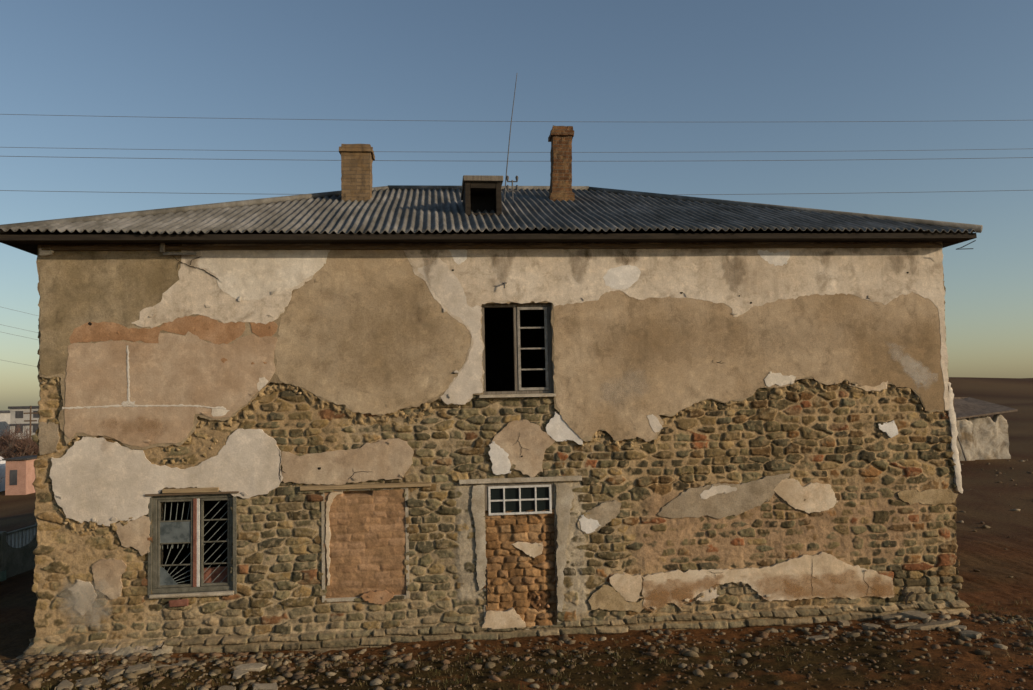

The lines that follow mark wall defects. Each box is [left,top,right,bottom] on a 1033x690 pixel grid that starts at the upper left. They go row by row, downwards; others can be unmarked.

crack [172,255,221,282]
spalling [38,242,963,558]
peeling [69,558,127,615]
spalling [360,590,394,605]
peeling [588,551,895,614]